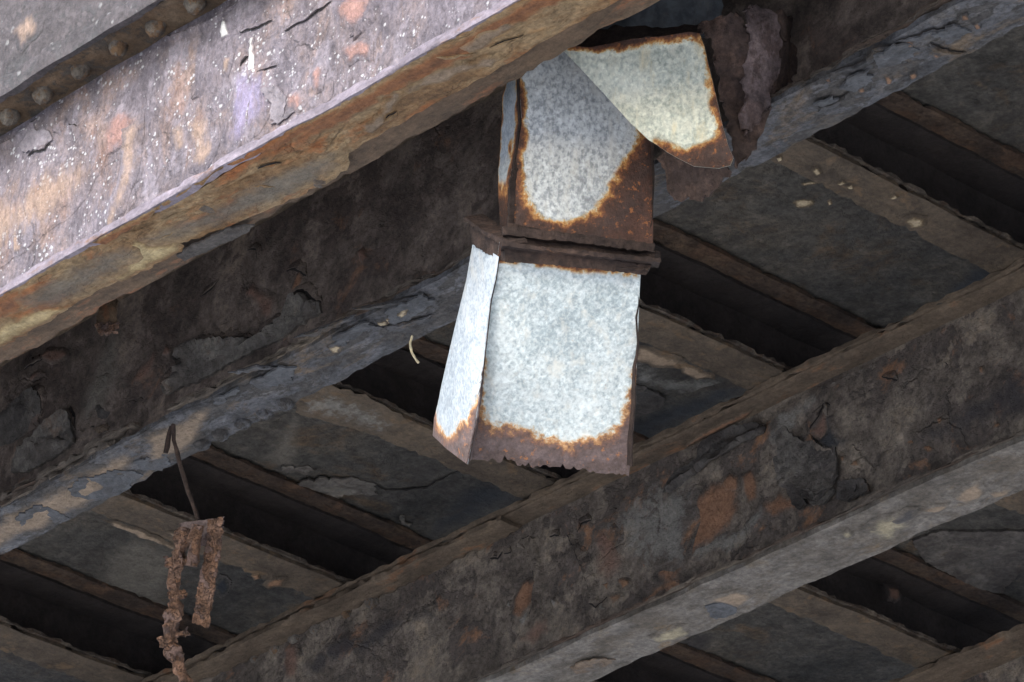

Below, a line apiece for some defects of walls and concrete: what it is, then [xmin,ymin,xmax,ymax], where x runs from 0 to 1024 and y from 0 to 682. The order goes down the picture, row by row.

corrosion [0,0,569,282]
corrosion [498,32,733,243]
peeling [840,69,874,93]
corrosion [433,345,715,477]
corrosion [692,469,745,554]
corrosion [156,626,190,648]